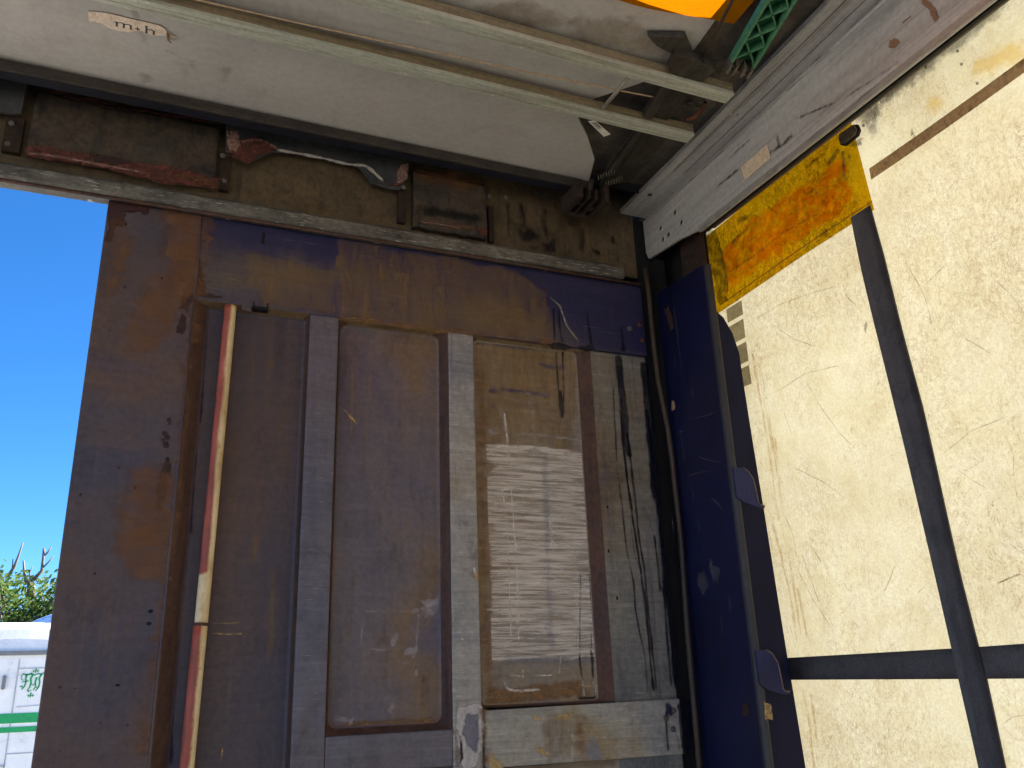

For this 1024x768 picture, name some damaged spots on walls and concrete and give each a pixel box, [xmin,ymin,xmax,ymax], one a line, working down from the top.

rust [24,145,220,189]
rust [46,91,408,186]
peeling [456,703,503,768]